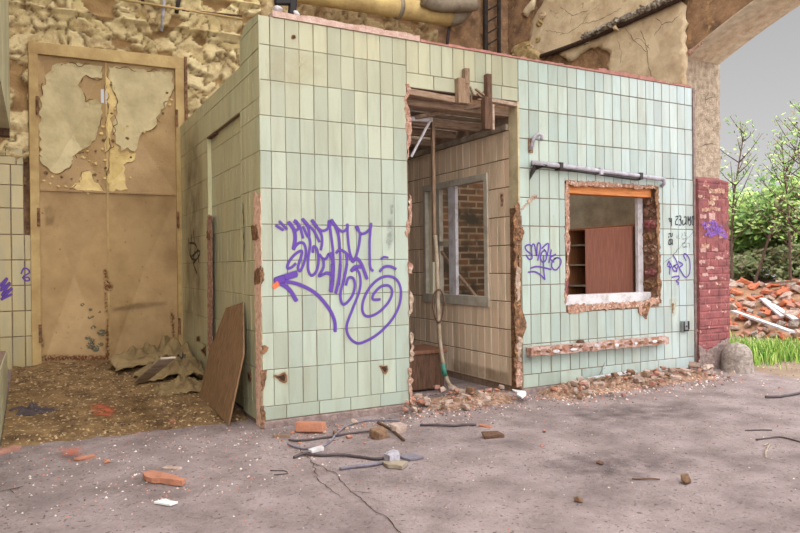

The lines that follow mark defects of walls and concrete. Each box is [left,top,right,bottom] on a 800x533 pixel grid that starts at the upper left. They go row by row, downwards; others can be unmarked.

peeling [39,62,175,195]
spalling [0,0,704,162]
crack [617,12,682,77]
spalling [251,191,269,428]
spalling [407,328,416,406]
spalling [513,195,537,388]
peeling [535,340,666,353]
spalling [564,180,662,319]
crack [300,449,401,533]